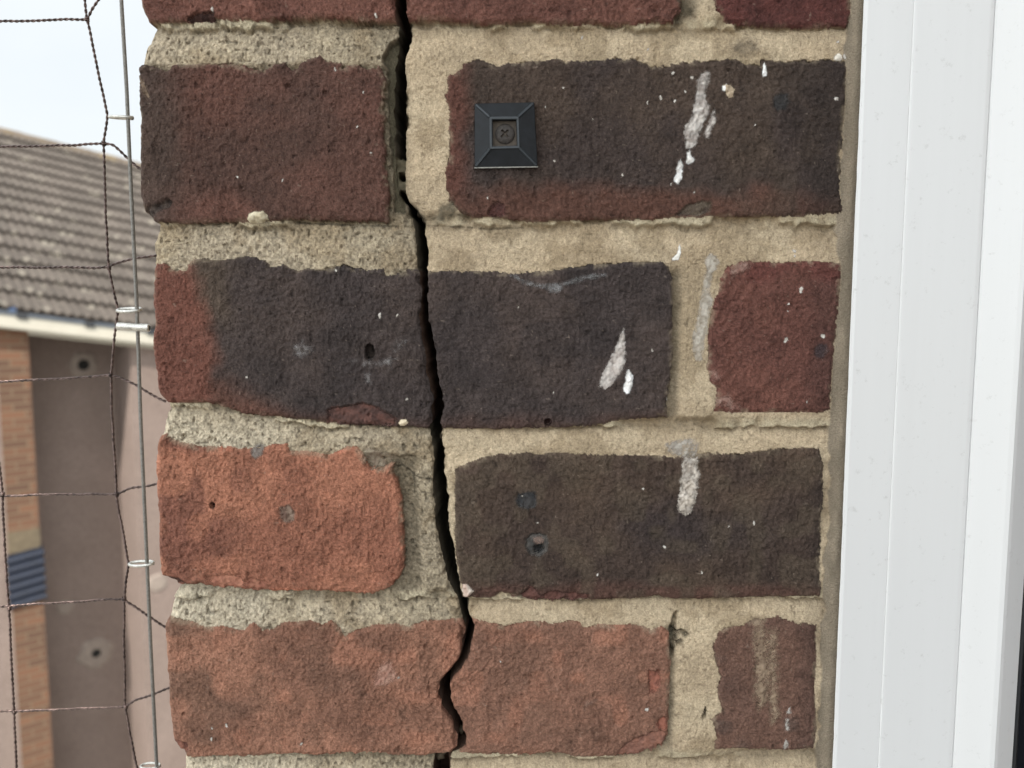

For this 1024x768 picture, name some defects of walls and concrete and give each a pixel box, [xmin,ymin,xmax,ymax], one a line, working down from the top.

crack [297,0,475,768]